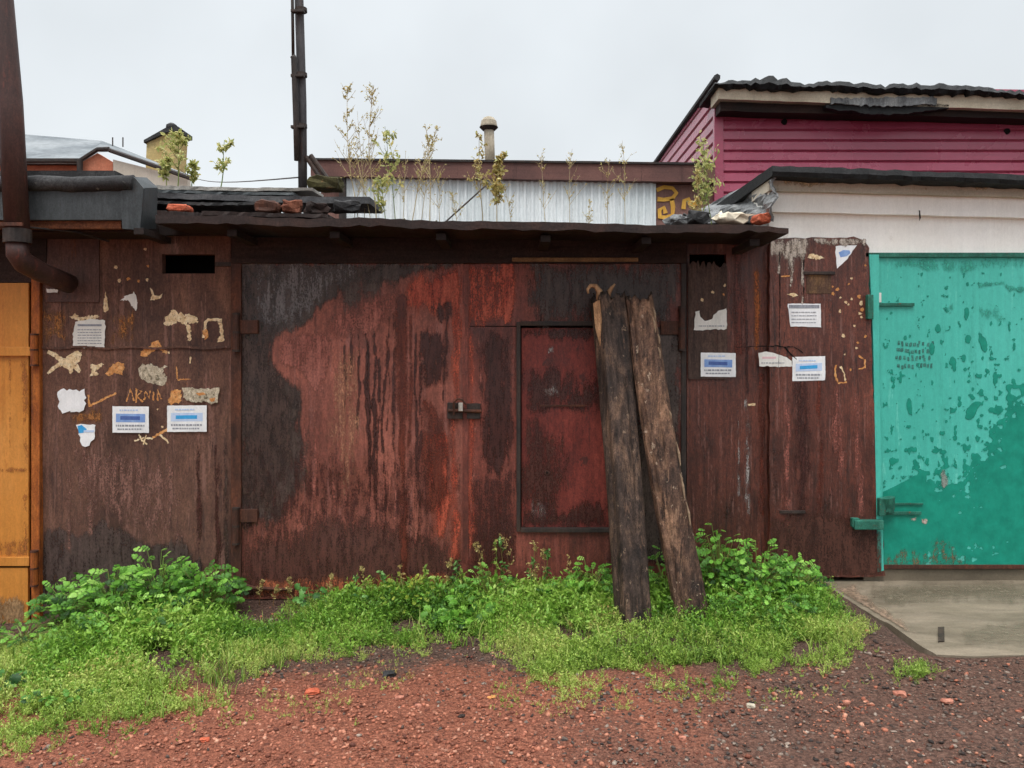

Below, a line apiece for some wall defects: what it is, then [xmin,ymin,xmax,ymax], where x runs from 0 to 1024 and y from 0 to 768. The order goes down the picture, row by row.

rust [66,449,180,550]
rust [214,445,229,587]
rust [242,264,515,598]
rust [728,245,766,515]
rust [782,380,863,524]
peeling [883,272,1024,565]